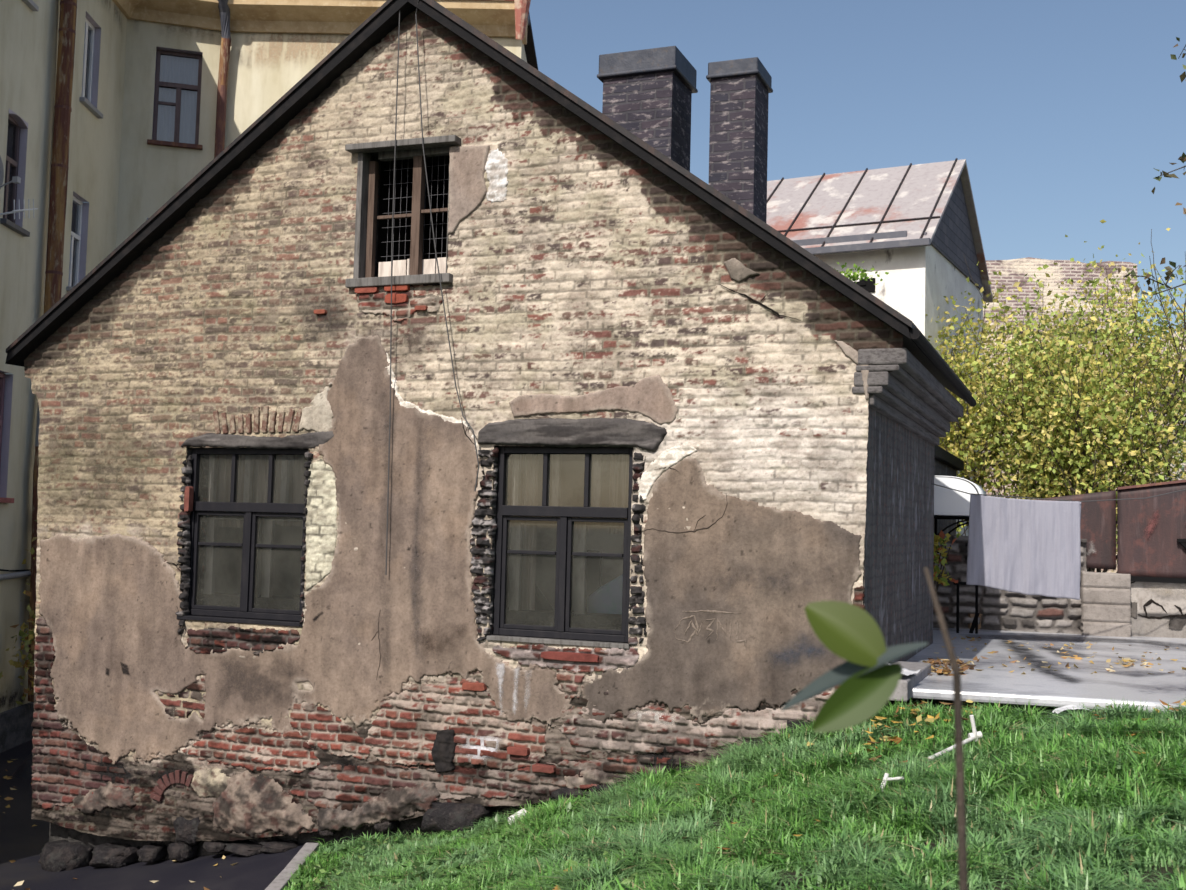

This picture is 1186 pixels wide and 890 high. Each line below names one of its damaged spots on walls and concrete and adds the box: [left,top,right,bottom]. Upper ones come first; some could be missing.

flaking render [447,145,509,235]
crack [718,284,801,321]
flaking render [31,334,869,811]
crack [1131,581,1186,619]
damp [497,664,518,710]